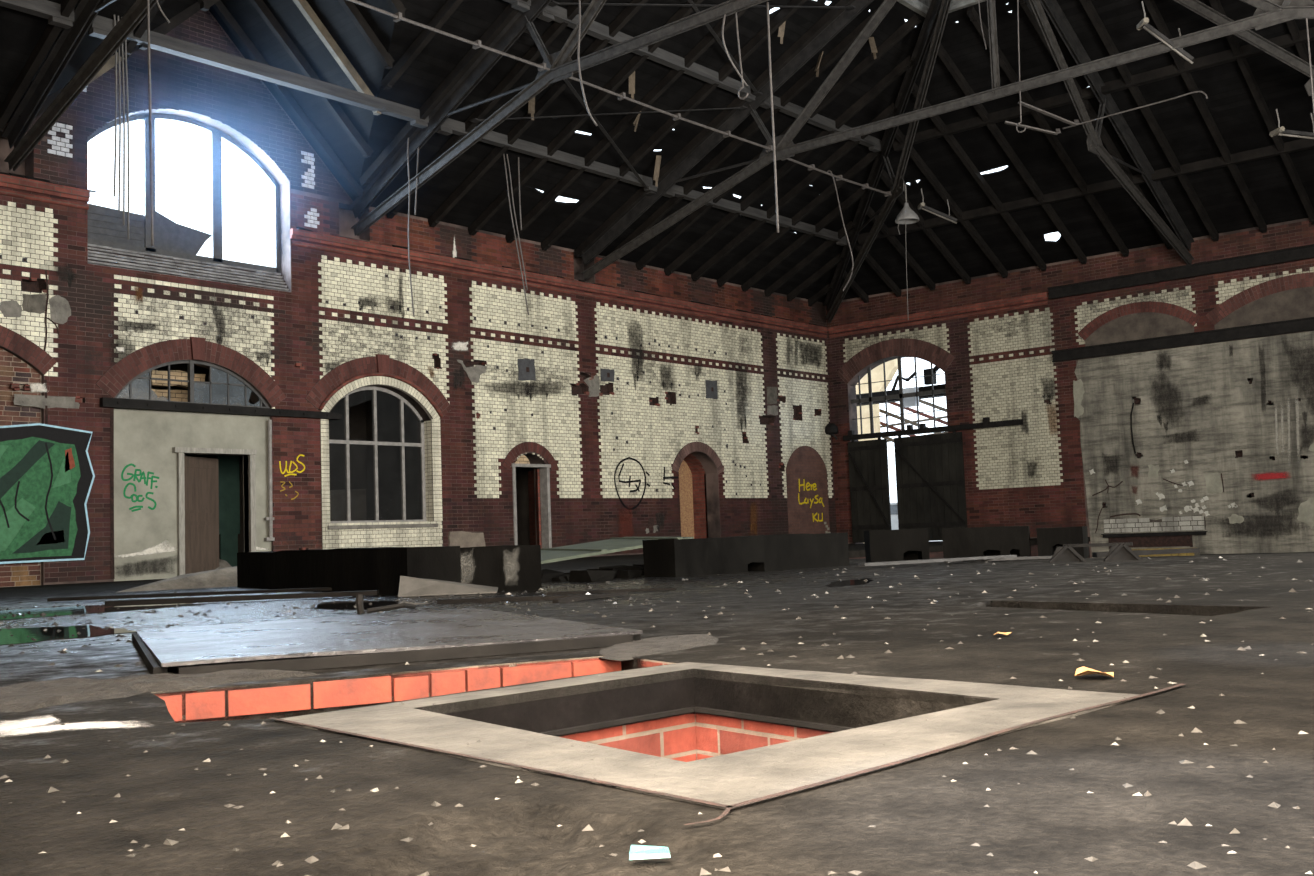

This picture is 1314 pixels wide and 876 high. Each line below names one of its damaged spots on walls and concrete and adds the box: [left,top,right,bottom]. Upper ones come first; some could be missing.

water stain [1275,399,1307,456]
flaking render [1297,498,1314,529]